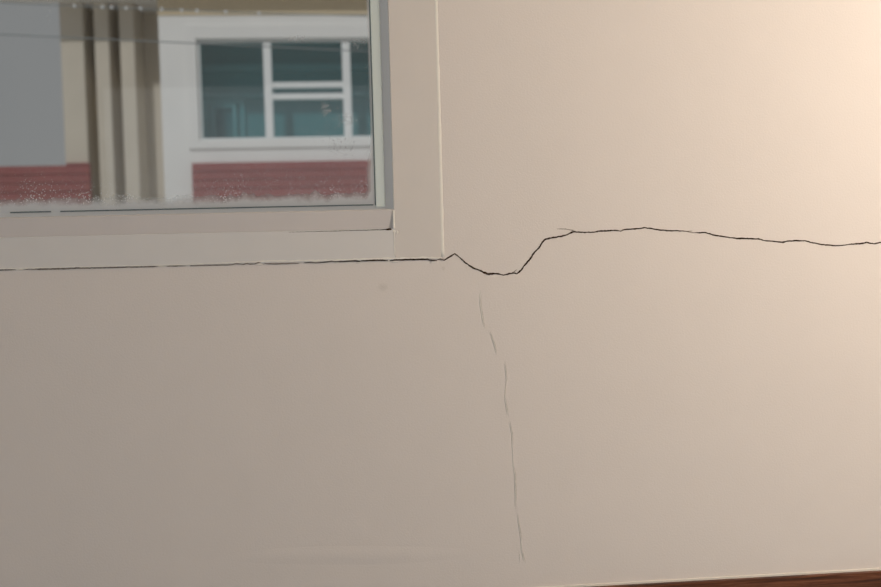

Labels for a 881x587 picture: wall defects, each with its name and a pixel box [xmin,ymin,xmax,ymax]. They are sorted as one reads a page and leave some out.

crack [0,226,881,564]